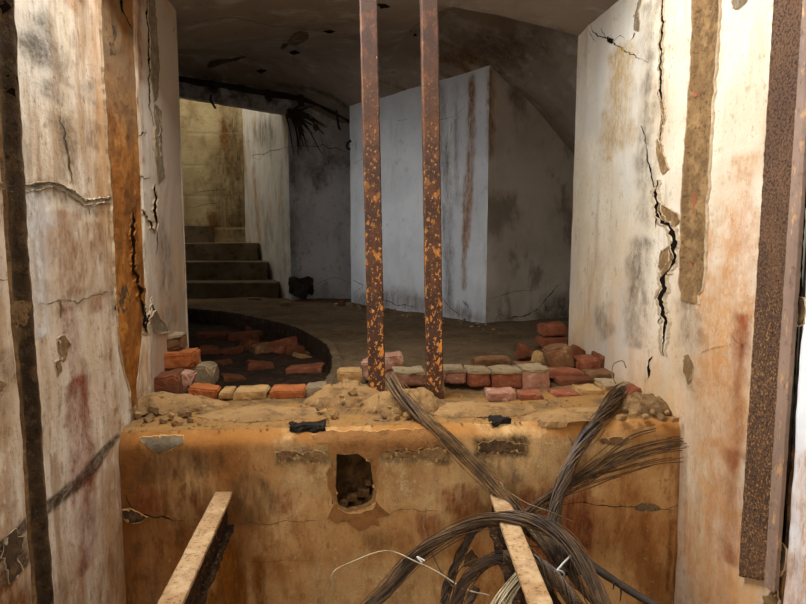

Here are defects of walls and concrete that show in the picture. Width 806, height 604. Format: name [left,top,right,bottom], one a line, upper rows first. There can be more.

crack [0,118,160,336]
rust [439,52,493,256]
crack [589,0,680,379]
spalling [655,0,748,304]
spalling [122,508,147,524]
spalling [275,427,448,531]
spalling [478,438,525,455]
crack [784,193,806,542]